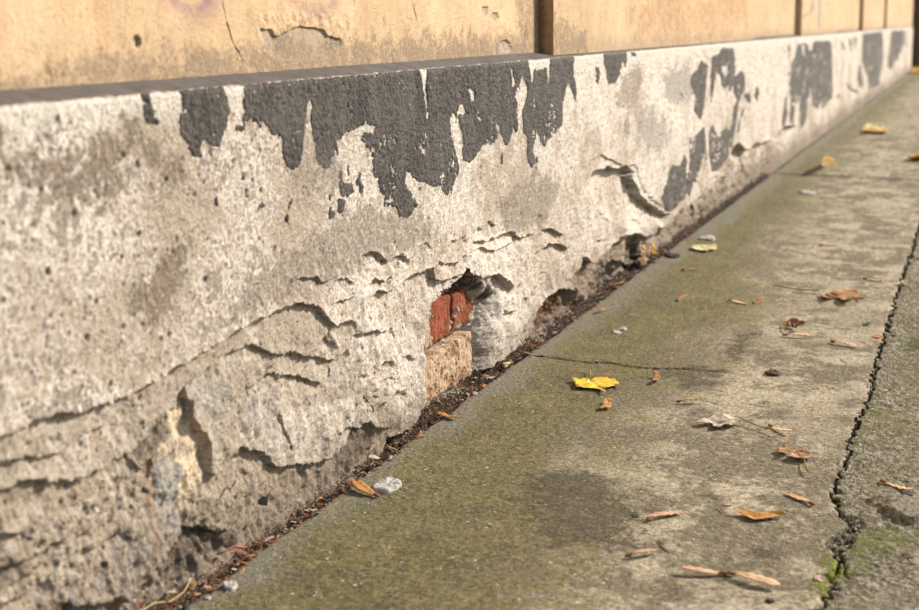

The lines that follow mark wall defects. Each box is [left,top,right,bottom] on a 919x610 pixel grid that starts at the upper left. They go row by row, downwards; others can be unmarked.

spalling [260,25,342,60]
peeling [141,93,160,124]
peeling [178,39,577,219]
crack [738,142,919,181]
spalling [515,30,906,351]
crack [526,355,721,372]
spalling [0,228,567,610]
crack [816,223,919,610]
spalling [869,492,919,522]
spalling [823,515,863,556]